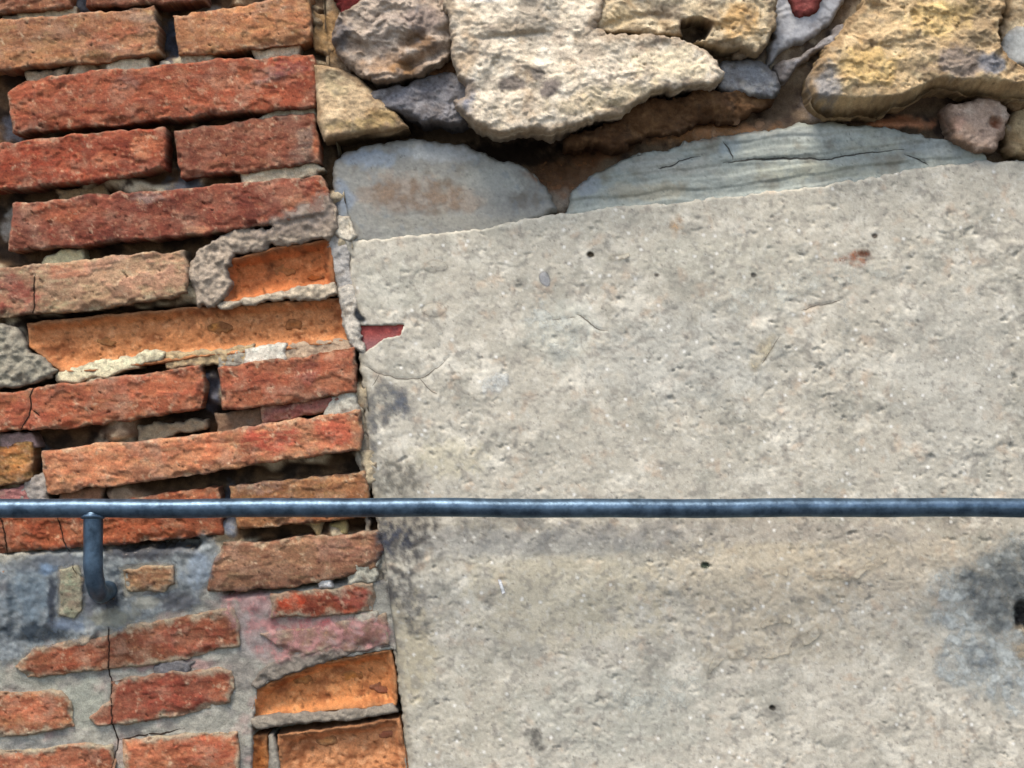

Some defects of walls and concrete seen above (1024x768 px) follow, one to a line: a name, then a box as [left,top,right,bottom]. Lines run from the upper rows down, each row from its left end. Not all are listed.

crack [637,142,928,169]
spalling [27,239,404,372]
crack [107,627,178,768]
spalling [252,649,409,768]